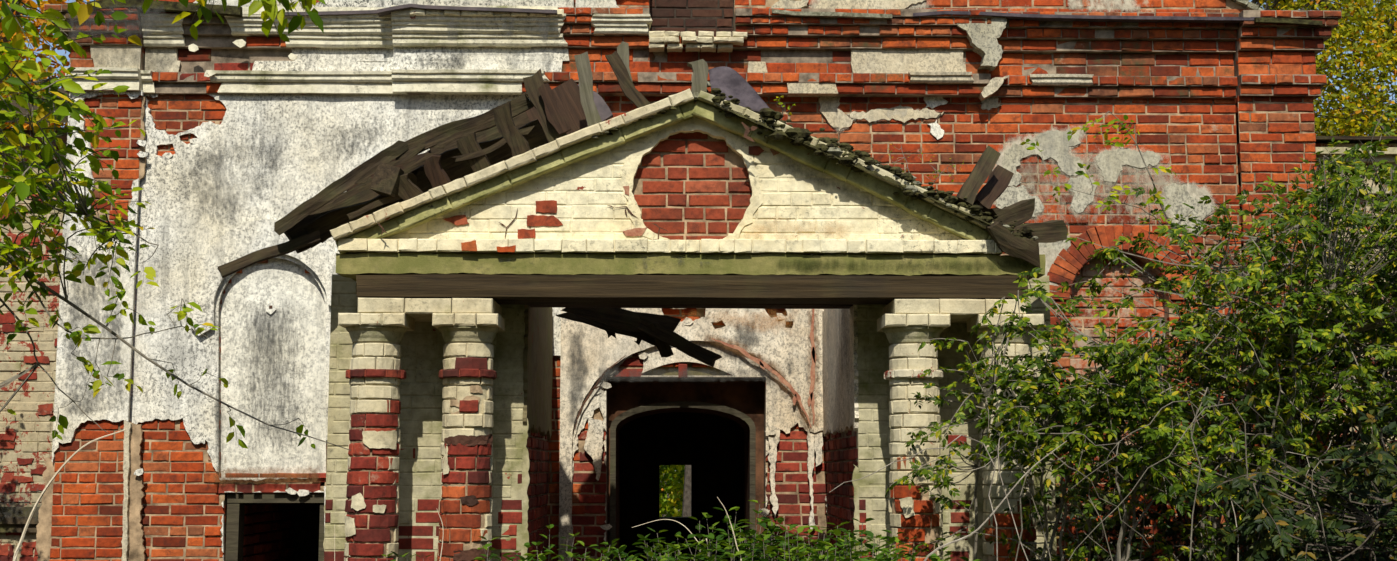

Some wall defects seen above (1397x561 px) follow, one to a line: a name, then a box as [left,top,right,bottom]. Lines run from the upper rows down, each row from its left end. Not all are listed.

peeling [734,0,927,9]
spalling [82,39,254,232]
peeling [992,126,1162,217]
peeling [623,227,648,237]
peeling [1162,182,1215,236]
spalling [661,308,725,327]
spalling [766,309,793,328]
peeling [17,338,57,380]
spalling [600,352,648,389]
spalling [0,357,530,561]
spalling [572,408,612,561]
spalling [759,425,828,561]